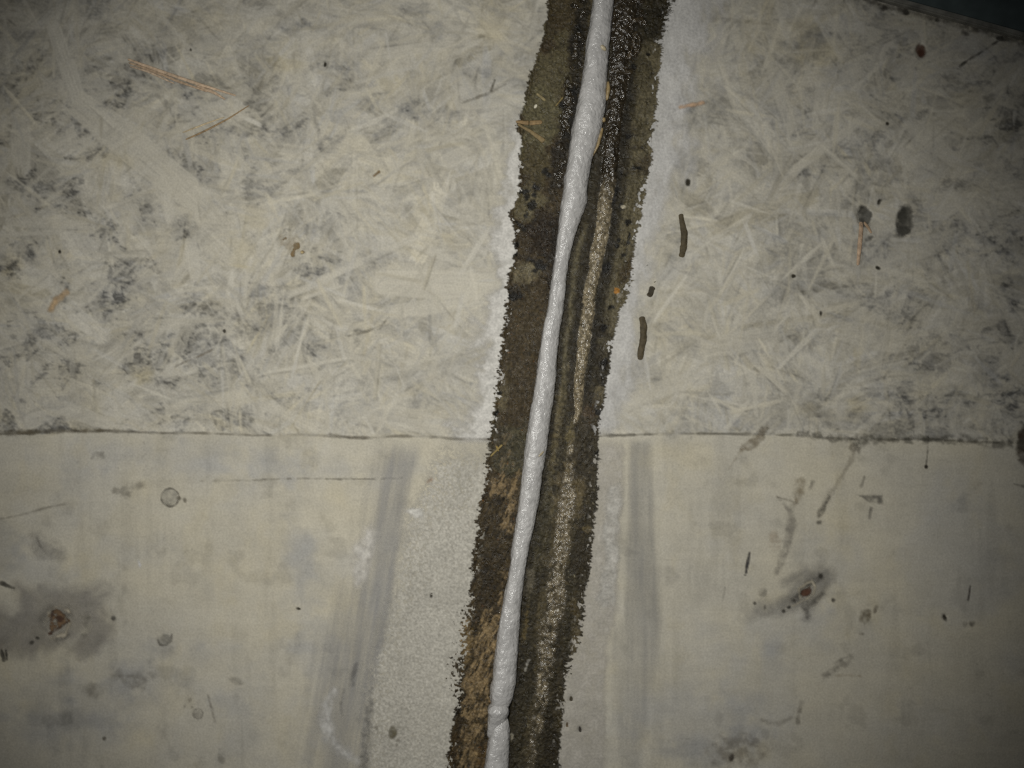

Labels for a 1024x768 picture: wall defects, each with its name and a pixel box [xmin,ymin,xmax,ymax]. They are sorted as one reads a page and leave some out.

rust [30,608,71,644]
damp [445,0,593,768]
damp [507,0,675,768]
rust [782,574,822,612]